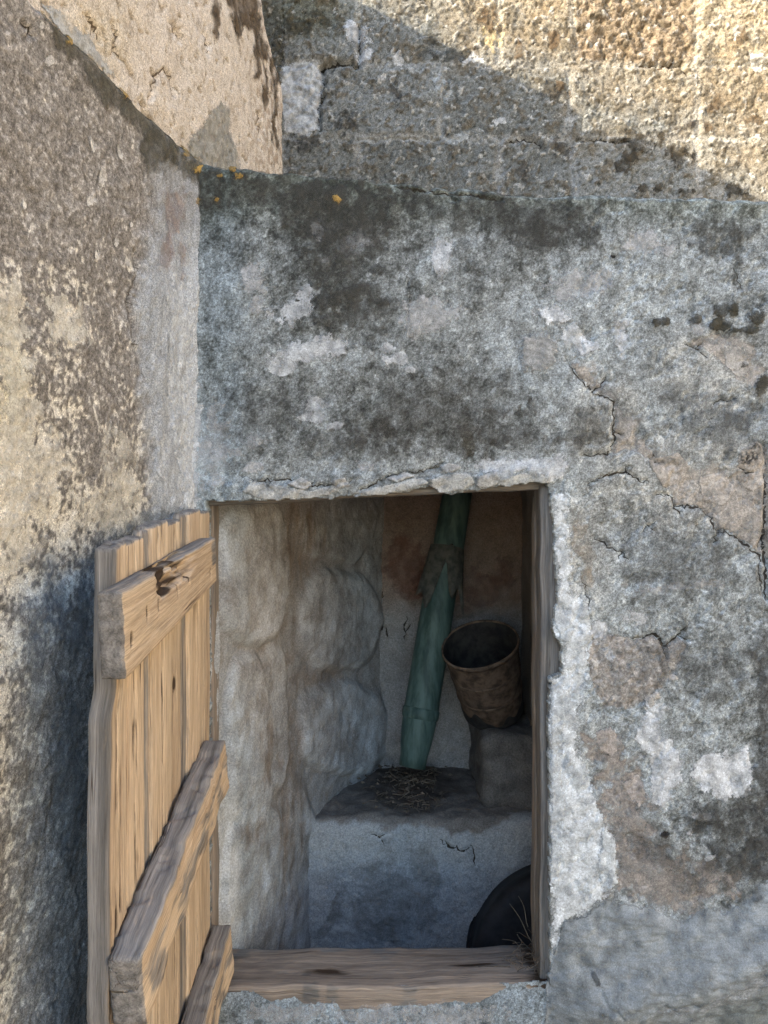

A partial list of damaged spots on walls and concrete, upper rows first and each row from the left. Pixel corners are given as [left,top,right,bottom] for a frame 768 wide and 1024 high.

leakage [240,174,459,377]
leakage [531,271,613,356]
leakage [297,396,344,431]
crack [241,463,443,496]
crack [567,361,767,600]
spalling [571,363,768,558]
spalling [585,632,687,709]
crack [632,627,687,657]
crack [440,839,475,864]
peeling [580,726,742,915]